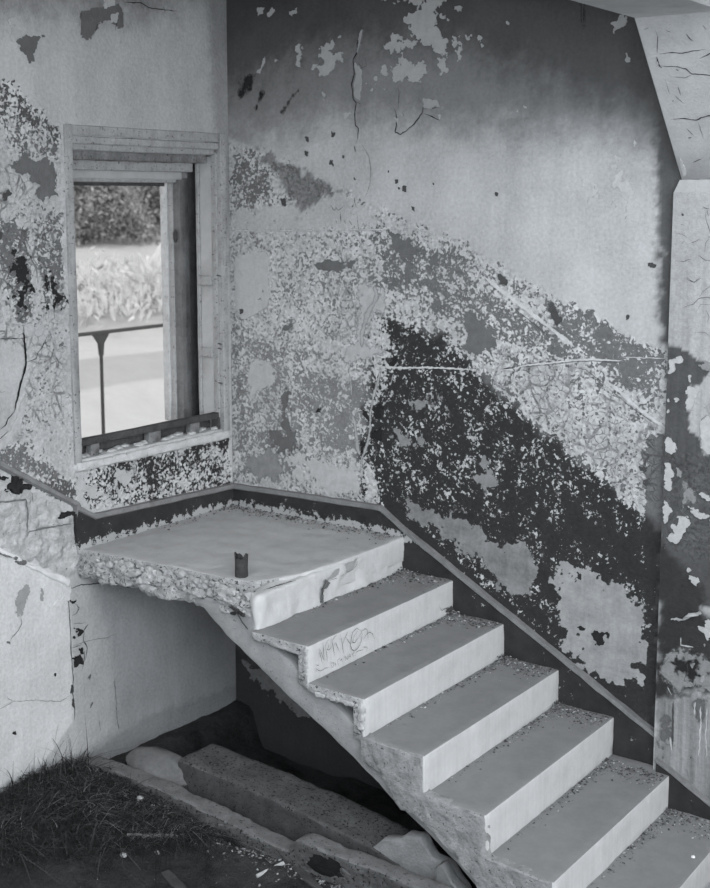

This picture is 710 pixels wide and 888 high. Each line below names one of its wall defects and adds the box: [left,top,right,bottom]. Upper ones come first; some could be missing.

crack [351,16,371,189]
peeling [365,0,484,135]
crack [644,26,710,138]
peeling [8,134,59,202]
crack [0,334,46,439]
peeling [7,249,69,315]
peeling [461,314,499,357]
peeling [667,375,710,454]
crack [675,208,710,337]
peeling [662,437,710,544]
spalling [0,472,251,644]
peeling [698,619,710,647]